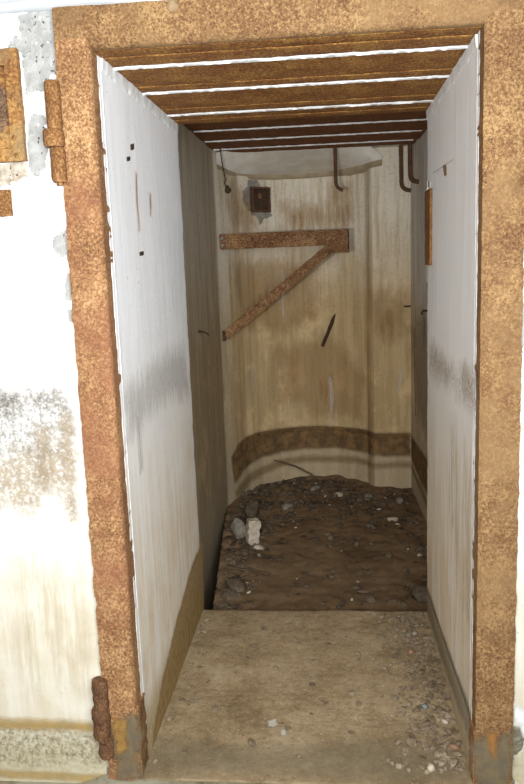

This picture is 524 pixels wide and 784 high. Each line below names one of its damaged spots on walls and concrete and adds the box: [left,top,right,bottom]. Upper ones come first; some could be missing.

spalling [5,10,56,100]
rust [0,86,9,132]
spalling [0,112,50,189]
water stain [0,392,75,509]
water stain [232,427,428,505]